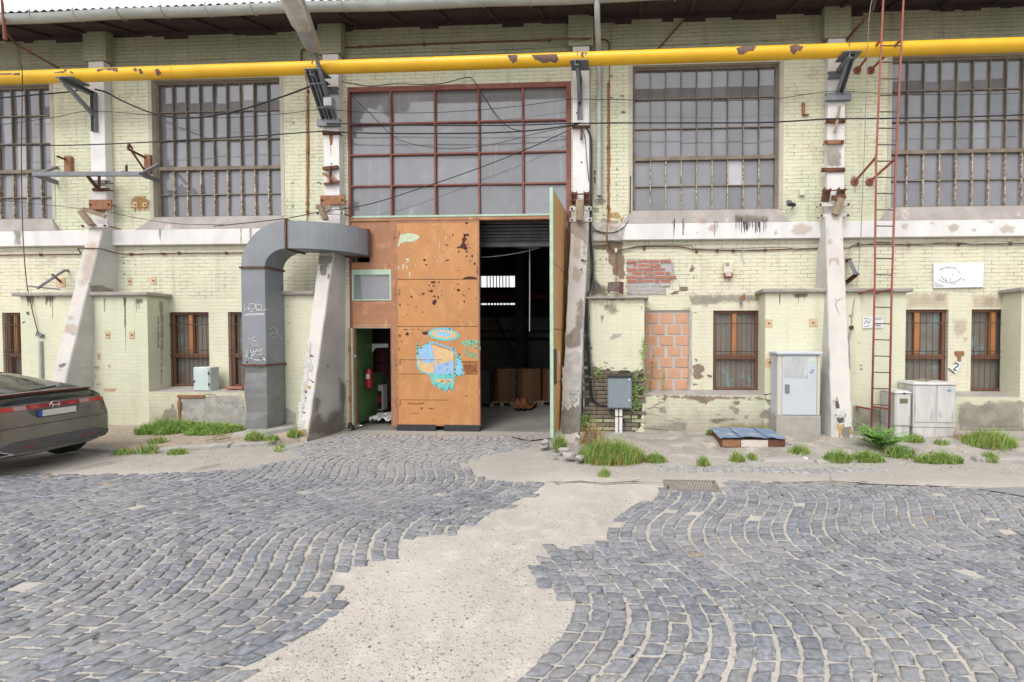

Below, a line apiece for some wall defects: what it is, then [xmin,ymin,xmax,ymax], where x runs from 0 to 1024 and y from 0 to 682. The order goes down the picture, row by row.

peeling [531,54,559,64]
rust [593,86,611,223]
rust [399,222,477,312]
peeling [592,184,625,279]
damp [735,215,767,232]
flaking render [561,284,763,434]